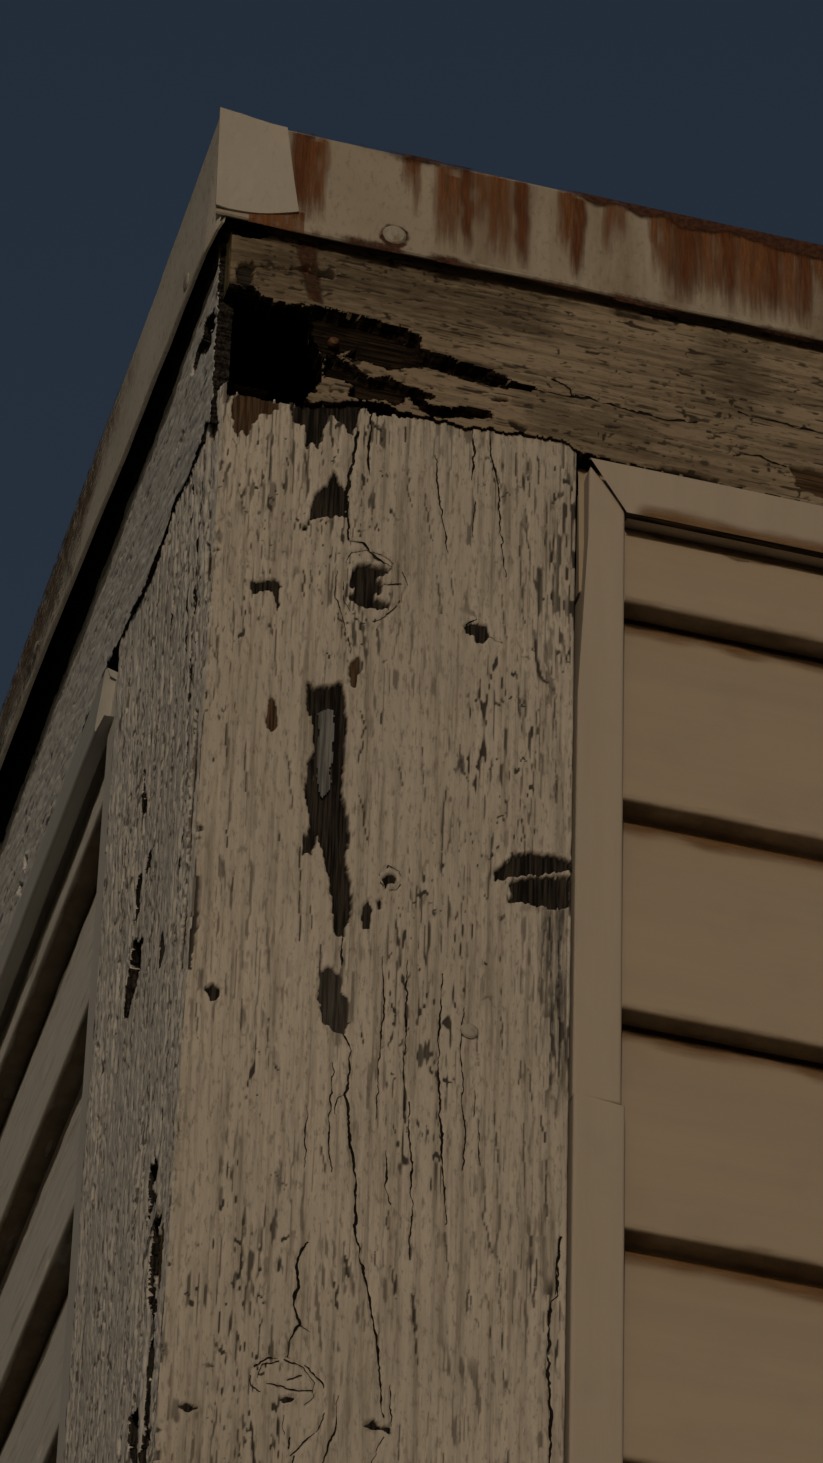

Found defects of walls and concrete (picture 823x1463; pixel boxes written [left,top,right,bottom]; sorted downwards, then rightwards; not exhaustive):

peeling [193,309,217,371]
corrosion [249,132,327,303]
corrosion [346,224,409,253]
corrosion [431,254,479,270]
corrosion [401,153,530,258]
corrosion [609,293,676,311]
corrosion [559,190,823,267]
peeling [227,395,361,540]
crack [170,458,206,753]
peeling [303,657,359,1035]
crack [249,956,481,1463]